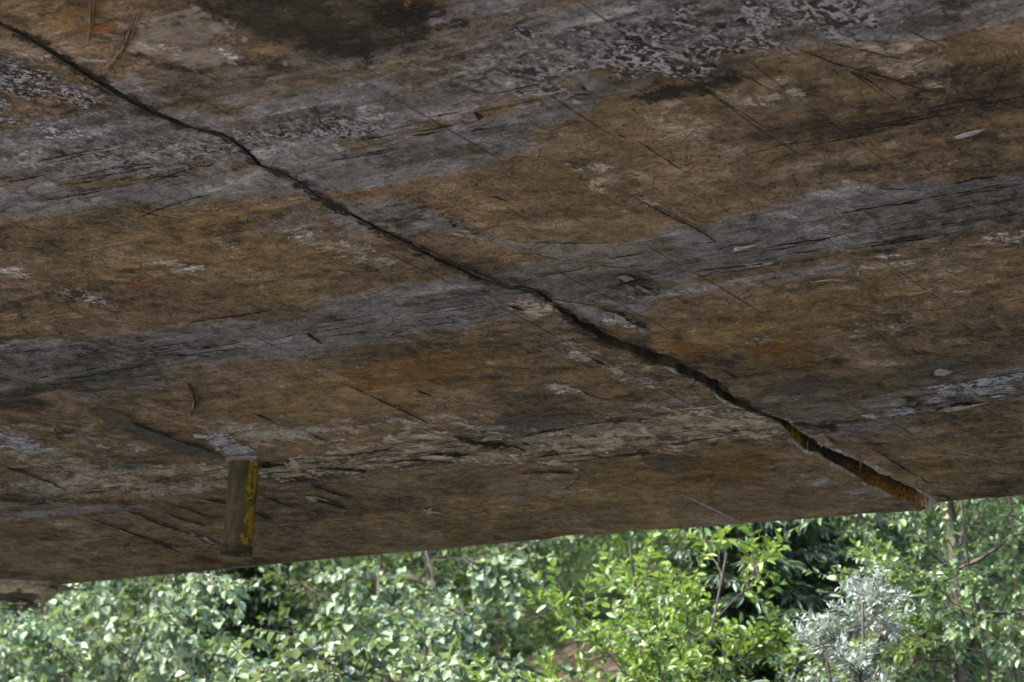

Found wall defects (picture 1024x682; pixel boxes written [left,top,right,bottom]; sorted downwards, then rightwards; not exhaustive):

water stain [80,0,470,76]
water stain [237,0,938,162]
crack [798,27,1024,109]
crack [836,176,1004,214]
crack [0,18,955,512]
crack [255,477,355,520]